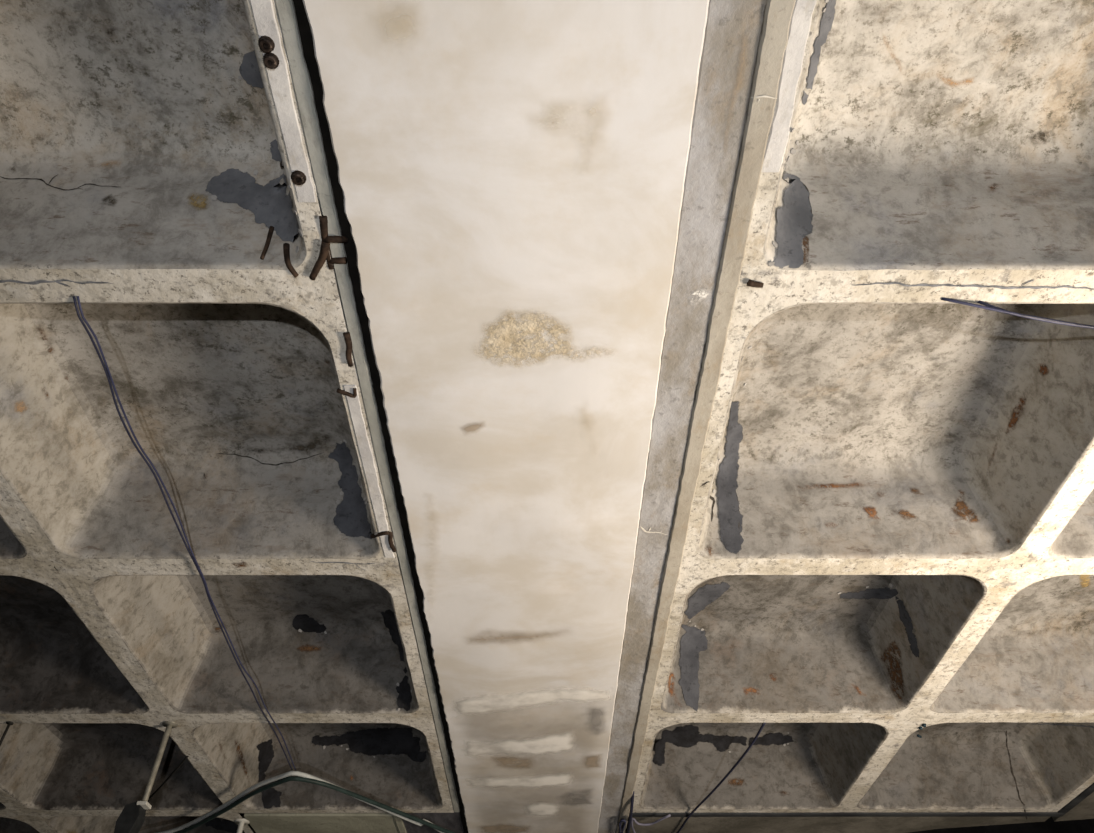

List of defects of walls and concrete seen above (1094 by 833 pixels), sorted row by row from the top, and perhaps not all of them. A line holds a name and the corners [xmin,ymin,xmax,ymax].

crack [0,175,117,190]
peeling [205,139,303,253]
peeling [768,128,813,268]
leakage [482,314,599,365]
peeling [328,440,372,539]
peeling [713,401,744,554]
corrosion [952,491,978,522]
peeling [679,582,730,711]
corrosion [881,641,904,701]
leakage [586,756,598,767]
leakage [590,709,602,730]
peeling [652,725,794,766]